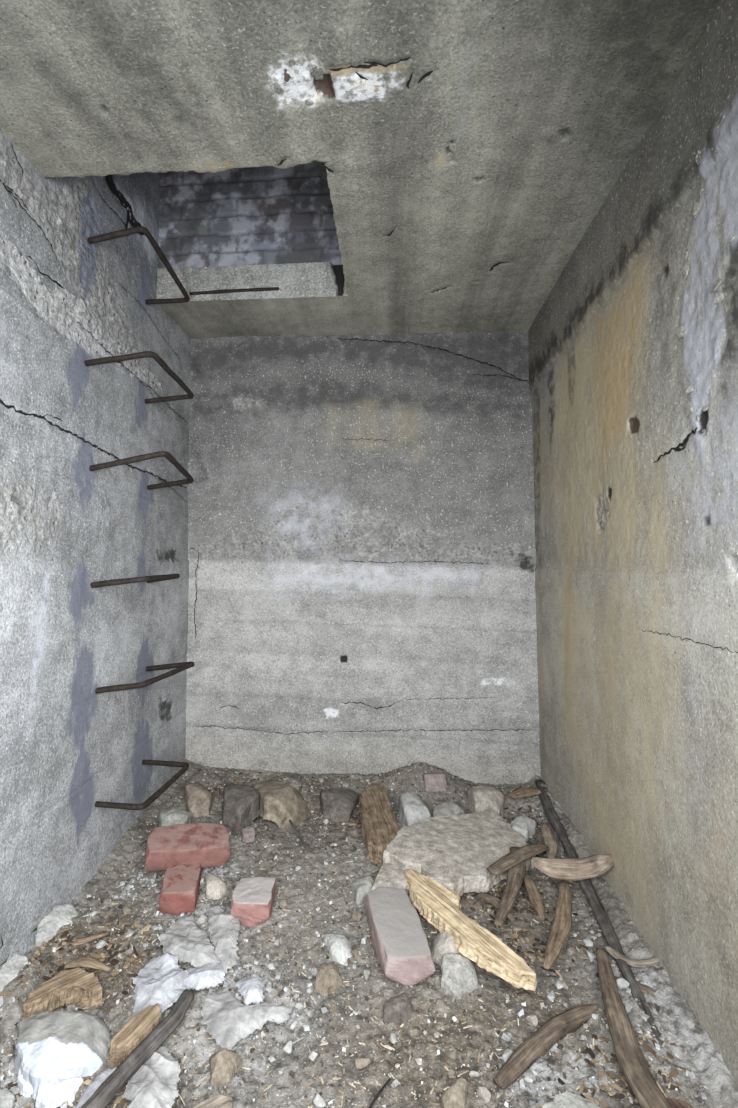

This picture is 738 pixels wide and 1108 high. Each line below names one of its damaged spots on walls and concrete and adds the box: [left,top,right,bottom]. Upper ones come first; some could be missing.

peeling [253,51,335,116]
crack [92,175,144,237]
crack [338,338,529,383]
crack [0,399,186,501]
crack [653,427,698,463]
leakage [189,91,738,883]
crack [643,631,738,653]